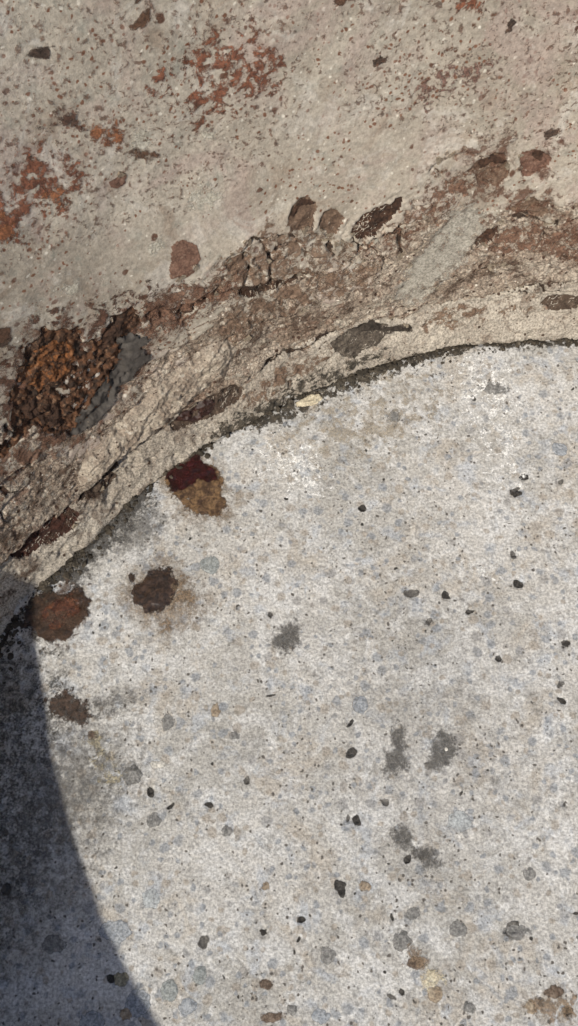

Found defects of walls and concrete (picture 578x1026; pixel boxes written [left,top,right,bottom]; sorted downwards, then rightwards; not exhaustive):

corrosion [0,0,325,275]
crack [212,215,428,298]
spalling [286,197,403,239]
spalling [0,285,221,459]
crack [249,330,337,377]
spalling [330,320,413,359]
damp [25,462,100,545]
damp [46,483,165,588]
corrosion [161,454,238,522]
crack [0,338,578,684]
corrosion [19,579,92,649]
damp [0,630,135,961]